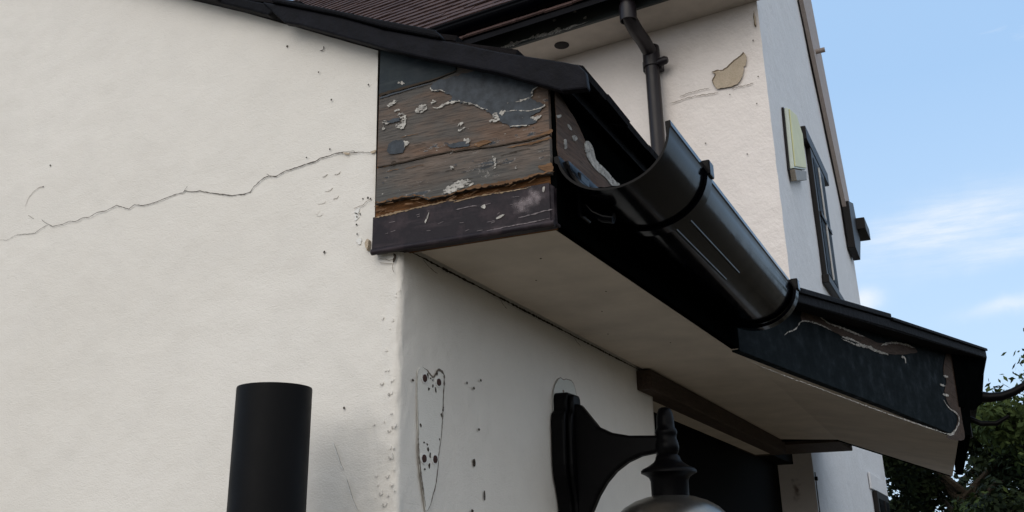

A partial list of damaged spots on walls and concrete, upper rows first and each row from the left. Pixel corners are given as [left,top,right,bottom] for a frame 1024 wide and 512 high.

spalling [712,52,747,95]
crack [11,150,376,238]
peeling [354,70,620,251]
peeling [786,312,917,363]
peeling [757,353,965,441]